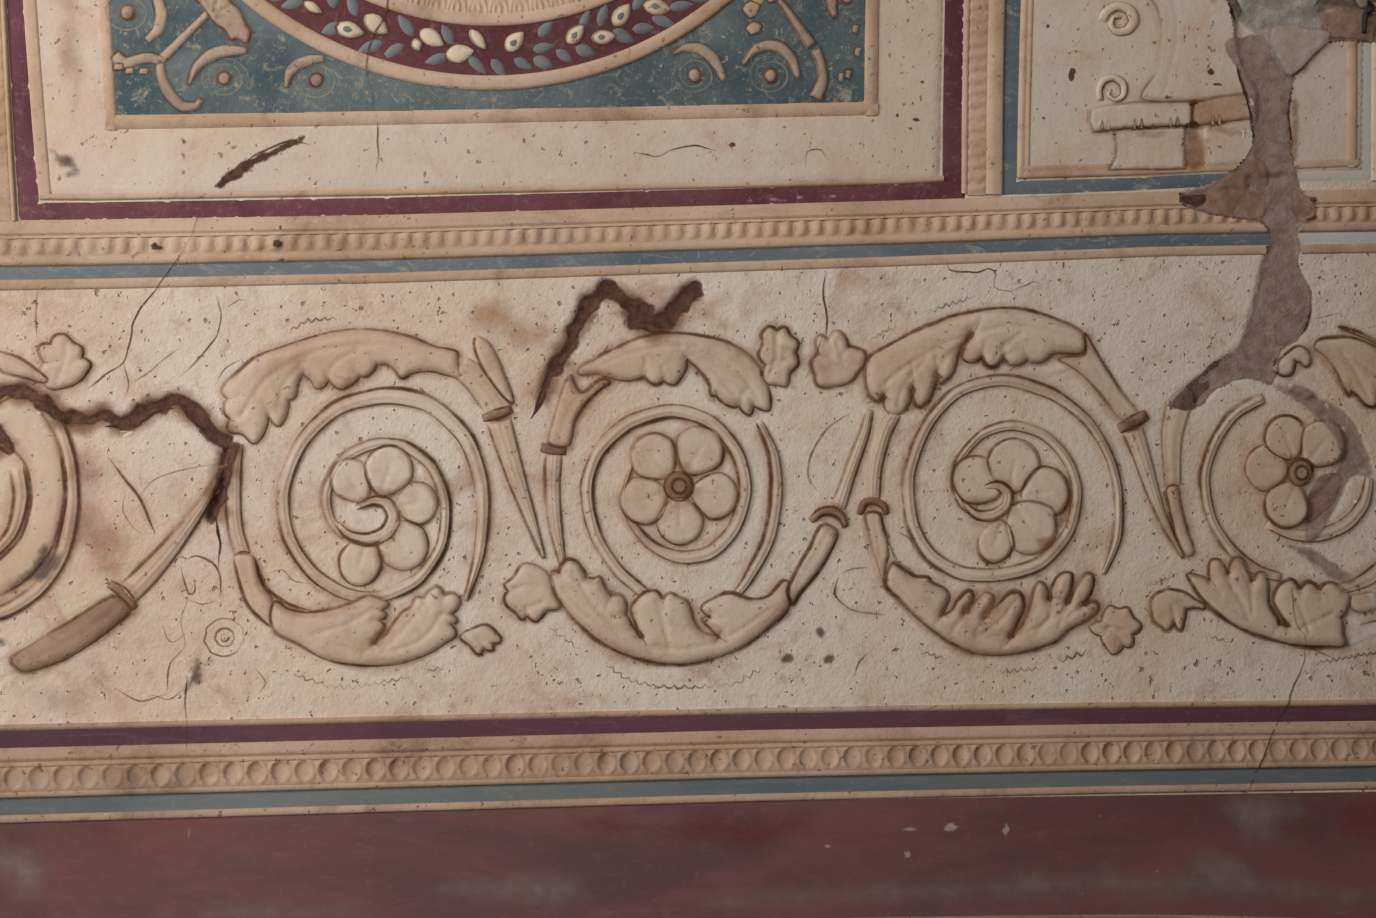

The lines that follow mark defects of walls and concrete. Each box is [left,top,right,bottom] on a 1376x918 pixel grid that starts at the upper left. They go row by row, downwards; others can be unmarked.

spalling [1320,0,1376,42]
crack [215,136,309,188]
crack [0,262,241,568]
crack [530,279,703,419]
crack [1250,646,1328,787]